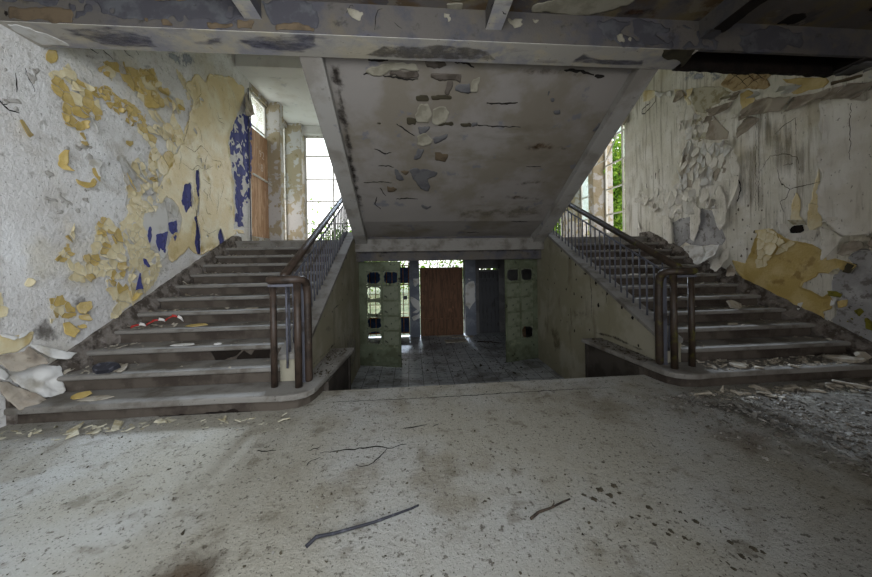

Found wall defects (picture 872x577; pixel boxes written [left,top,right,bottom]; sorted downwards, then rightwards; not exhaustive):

peeling [261,0,319,32]
peeling [347,8,363,21]
peeling [508,0,634,28]
peeling [366,61,480,192]
peeling [2,0,254,319]
crack [737,118,817,212]
peeling [634,49,872,342]
peeling [49,295,93,338]
crack [307,424,438,467]